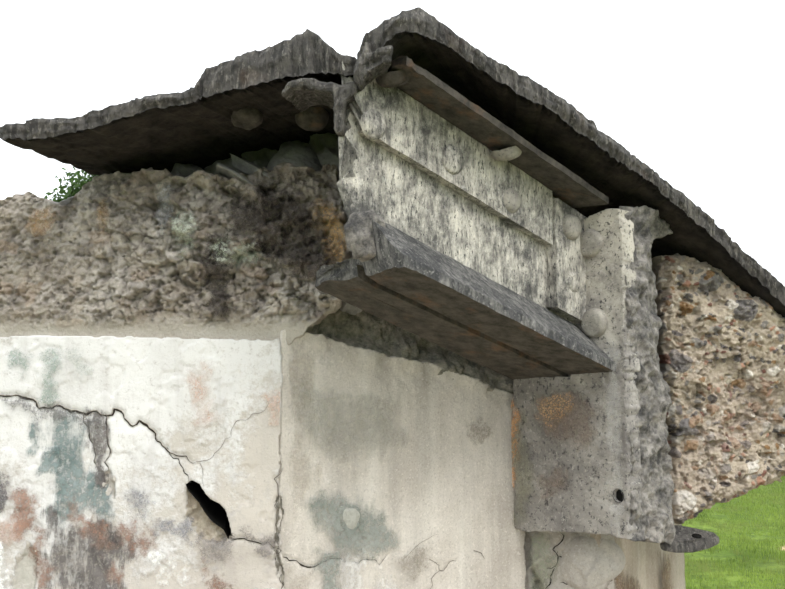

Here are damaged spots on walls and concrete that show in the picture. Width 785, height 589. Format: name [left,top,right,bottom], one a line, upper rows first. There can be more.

spalling [651,253,785,524]
leakage [0,474,9,512]
leakage [2,350,135,589]
crack [0,394,269,479]
leakage [155,517,194,537]
spalling [185,481,285,588]
leakage [310,494,397,589]